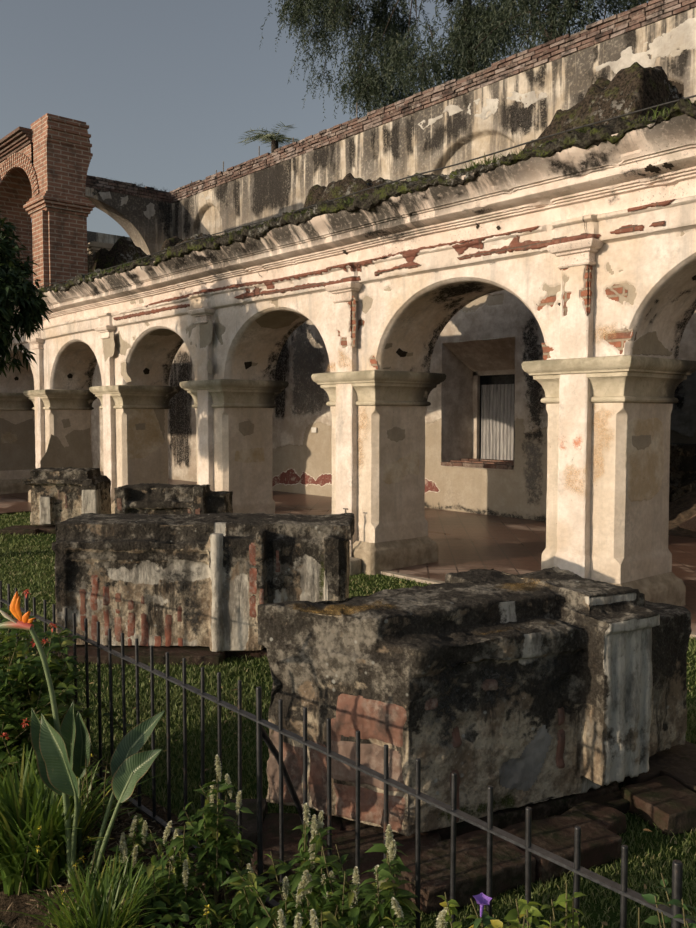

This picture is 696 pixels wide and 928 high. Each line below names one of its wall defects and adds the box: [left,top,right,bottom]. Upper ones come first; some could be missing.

flaking render [595,17,696,74]
water stain [252,156,297,215]
water stain [371,116,414,159]
water stain [498,98,547,135]
water stain [549,152,608,177]
flaking render [627,199,675,212]
flaking render [103,221,672,383]
water stain [154,339,192,467]
water stain [264,322,327,418]
flaking render [670,371,696,437]
flaking render [272,422,332,497]
flaking render [425,417,548,521]